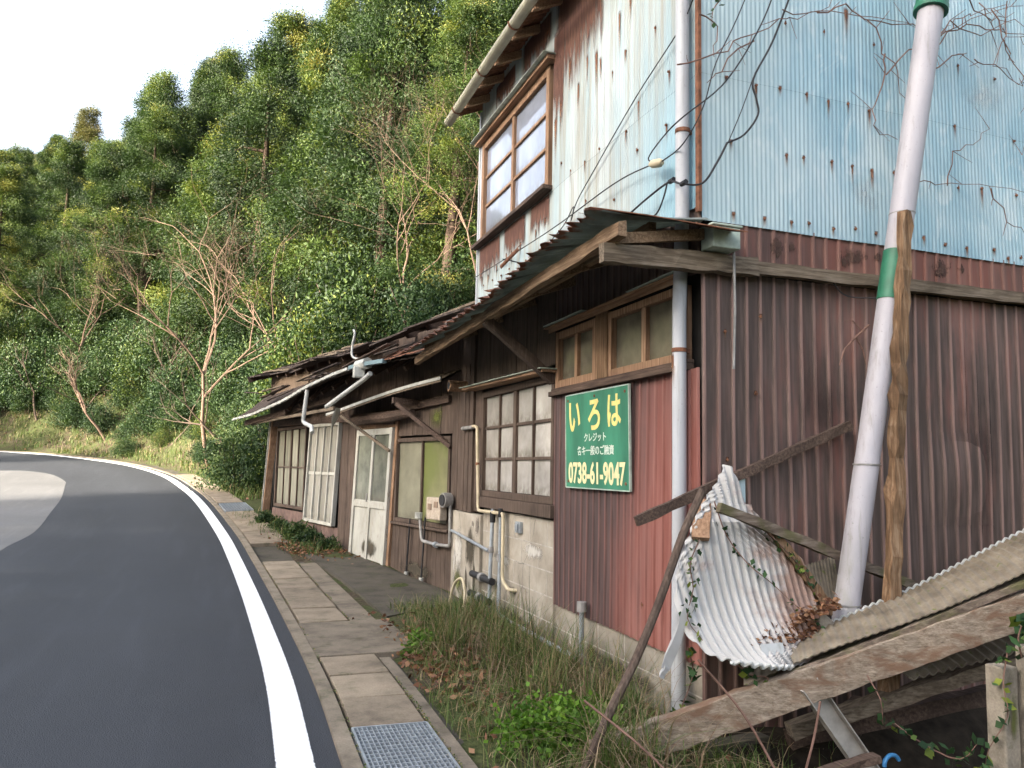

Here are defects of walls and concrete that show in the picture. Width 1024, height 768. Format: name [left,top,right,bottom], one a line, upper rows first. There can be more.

corrosion [496,0,613,146]
corrosion [479,194,549,286]
leakage [362,540,374,556]